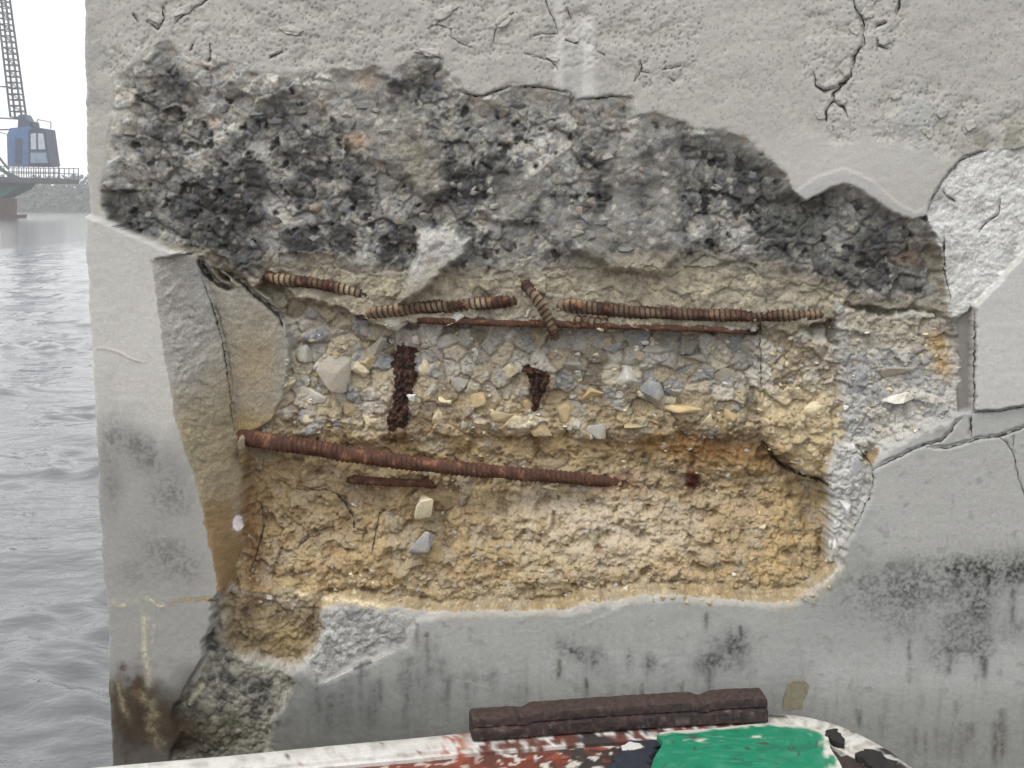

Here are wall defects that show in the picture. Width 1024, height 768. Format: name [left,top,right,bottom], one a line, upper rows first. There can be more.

crack [461,0,680,100]
crack [813,0,901,122]
crack [198,259,283,426]
crack [282,481,394,554]
corrosion [386,342,420,432]
corrosion [522,364,550,412]
spalling [101,0,1024,591]
spalling [172,262,962,761]
crack [763,441,831,487]
crack [851,311,1024,531]
leakage [891,557,1024,649]
corrosion [113,678,202,753]